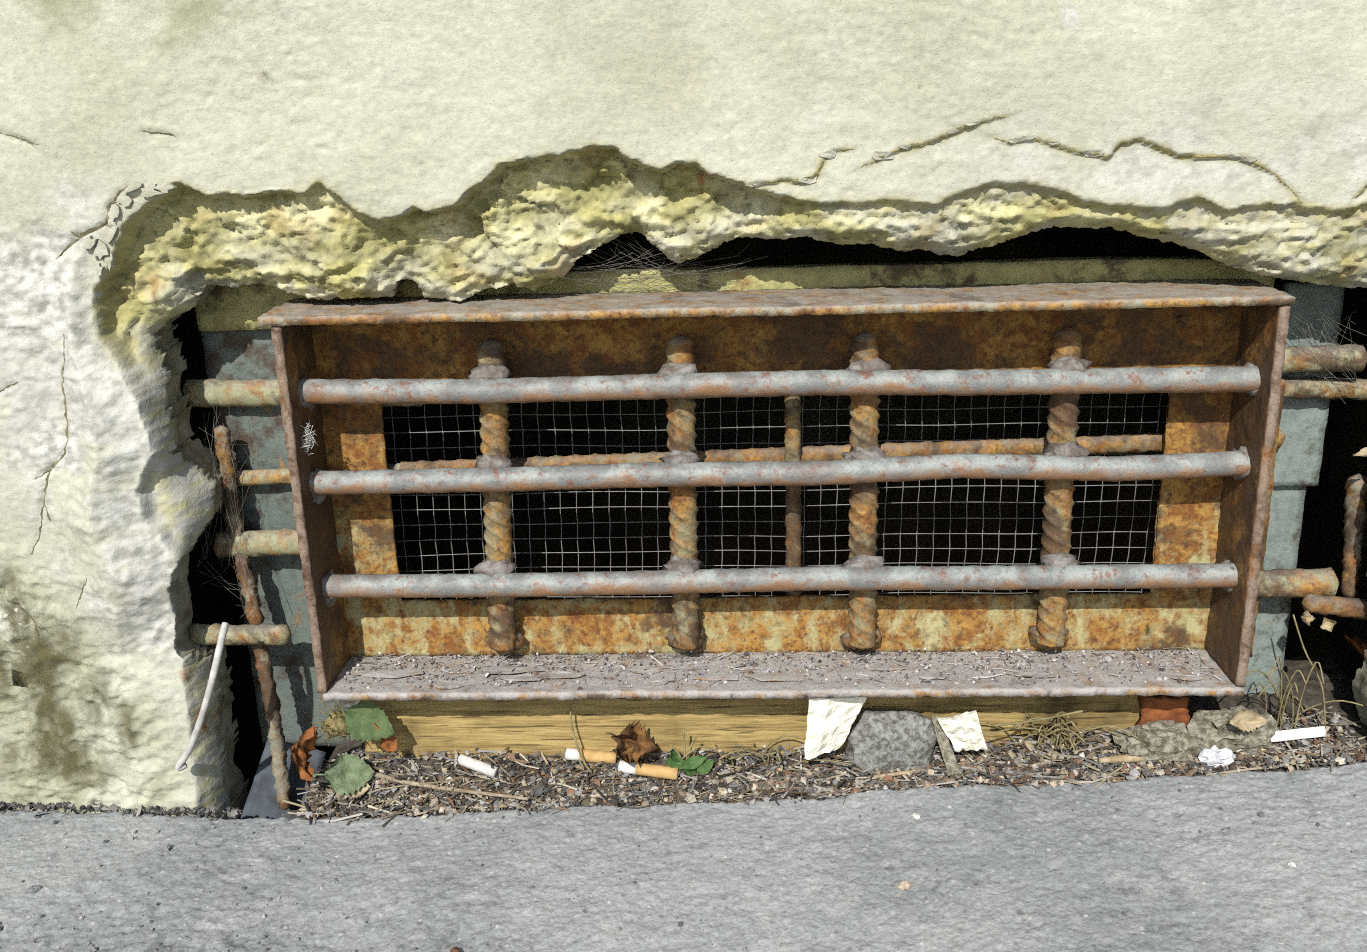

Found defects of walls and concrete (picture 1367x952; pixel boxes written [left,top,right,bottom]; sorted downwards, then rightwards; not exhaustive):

spalling [82,115,1367,426]
crack [31,334,68,554]
leakage [0,603,91,787]
spalling [183,643,249,820]
peeling [354,669,424,678]
peeling [481,666,585,681]